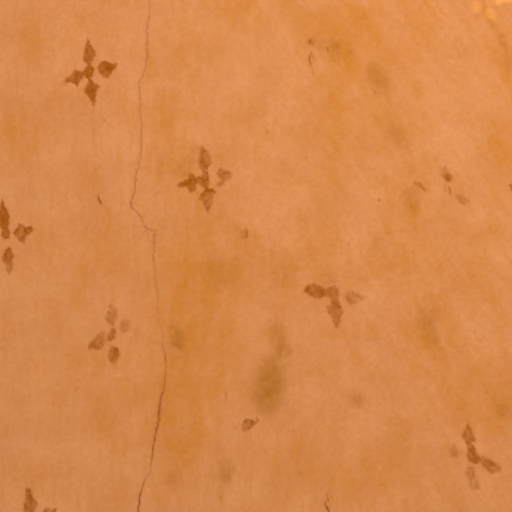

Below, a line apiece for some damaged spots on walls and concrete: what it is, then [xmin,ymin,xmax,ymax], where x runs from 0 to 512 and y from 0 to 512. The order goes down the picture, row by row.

crack [129,0,167,512]